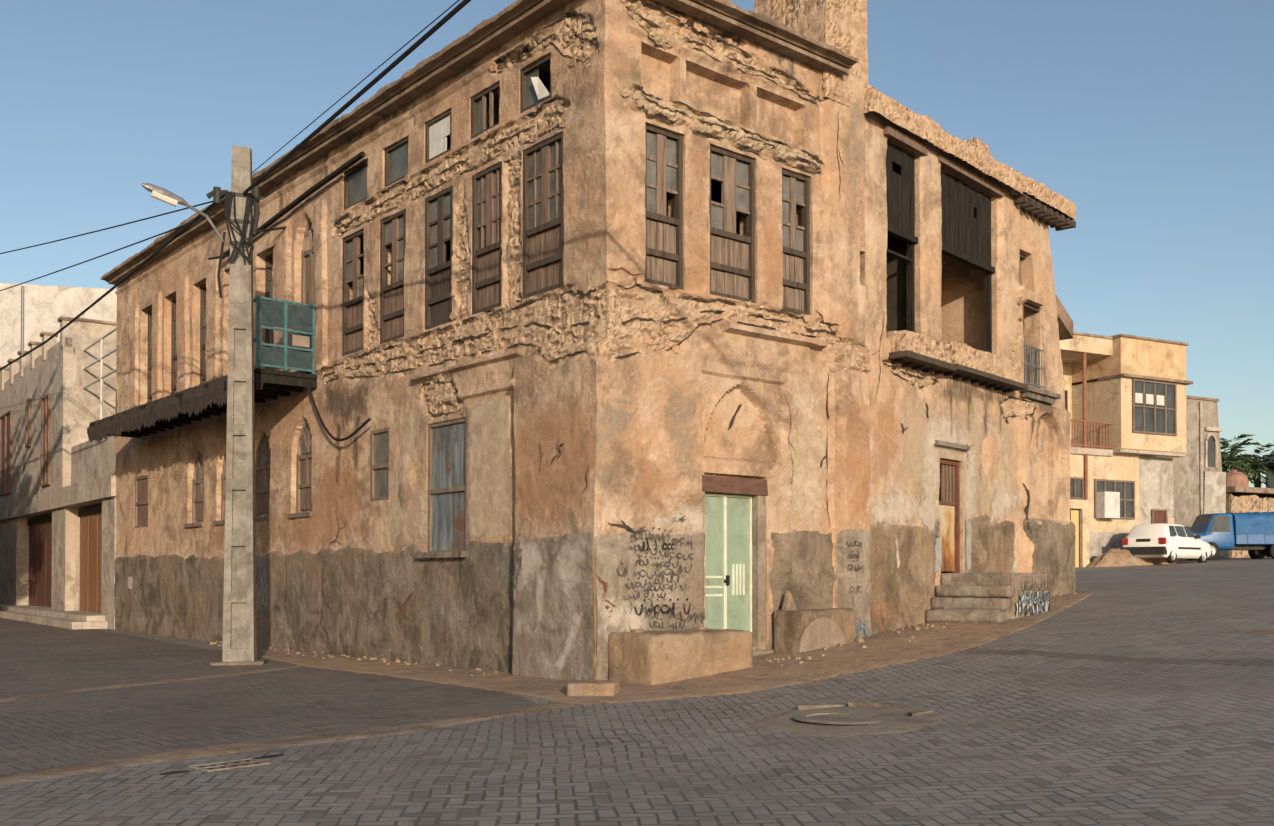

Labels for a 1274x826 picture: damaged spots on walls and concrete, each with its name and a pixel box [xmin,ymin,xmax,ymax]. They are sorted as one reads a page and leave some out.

spalling [489,10,599,74]
spalling [619,0,824,105]
spalling [619,82,825,175]
spalling [320,97,941,419]
crack [784,373,830,524]
water stain [256,562,270,615]
water stain [546,613,582,669]
water stain [597,595,645,632]